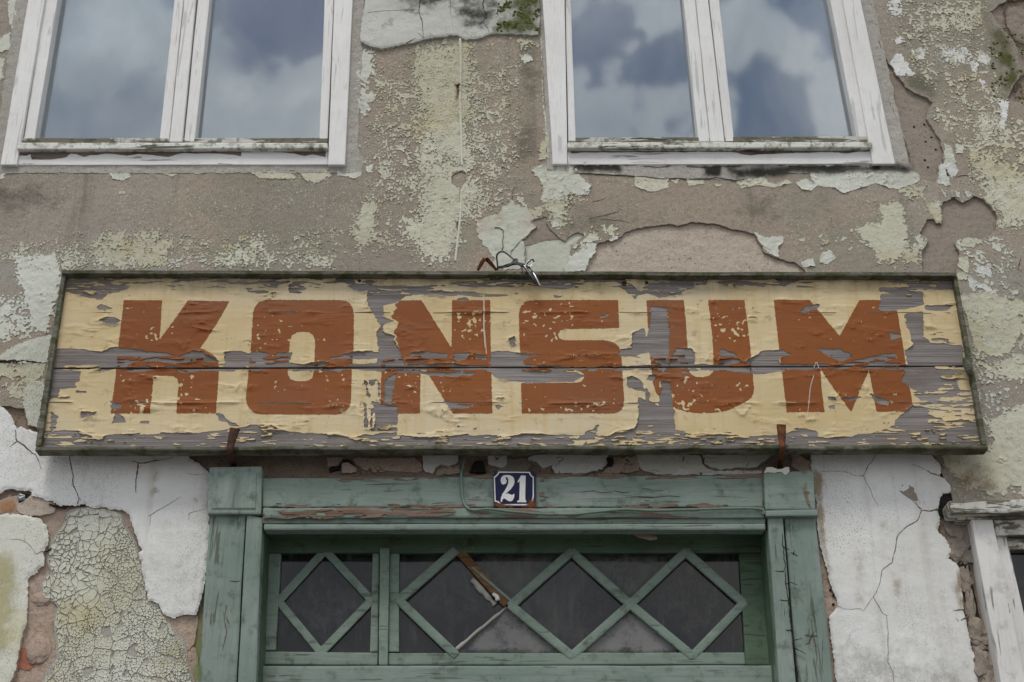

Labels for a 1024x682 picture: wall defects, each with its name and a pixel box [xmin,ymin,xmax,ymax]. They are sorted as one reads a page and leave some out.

flaking render [0,0,1024,497]
flaking render [8,494,86,682]
crack [49,456,85,509]
flaking render [119,511,142,552]
crack [132,458,206,515]
flaking render [161,611,199,682]
flaking render [190,454,837,682]
crack [837,501,939,634]
flaking render [938,493,996,682]